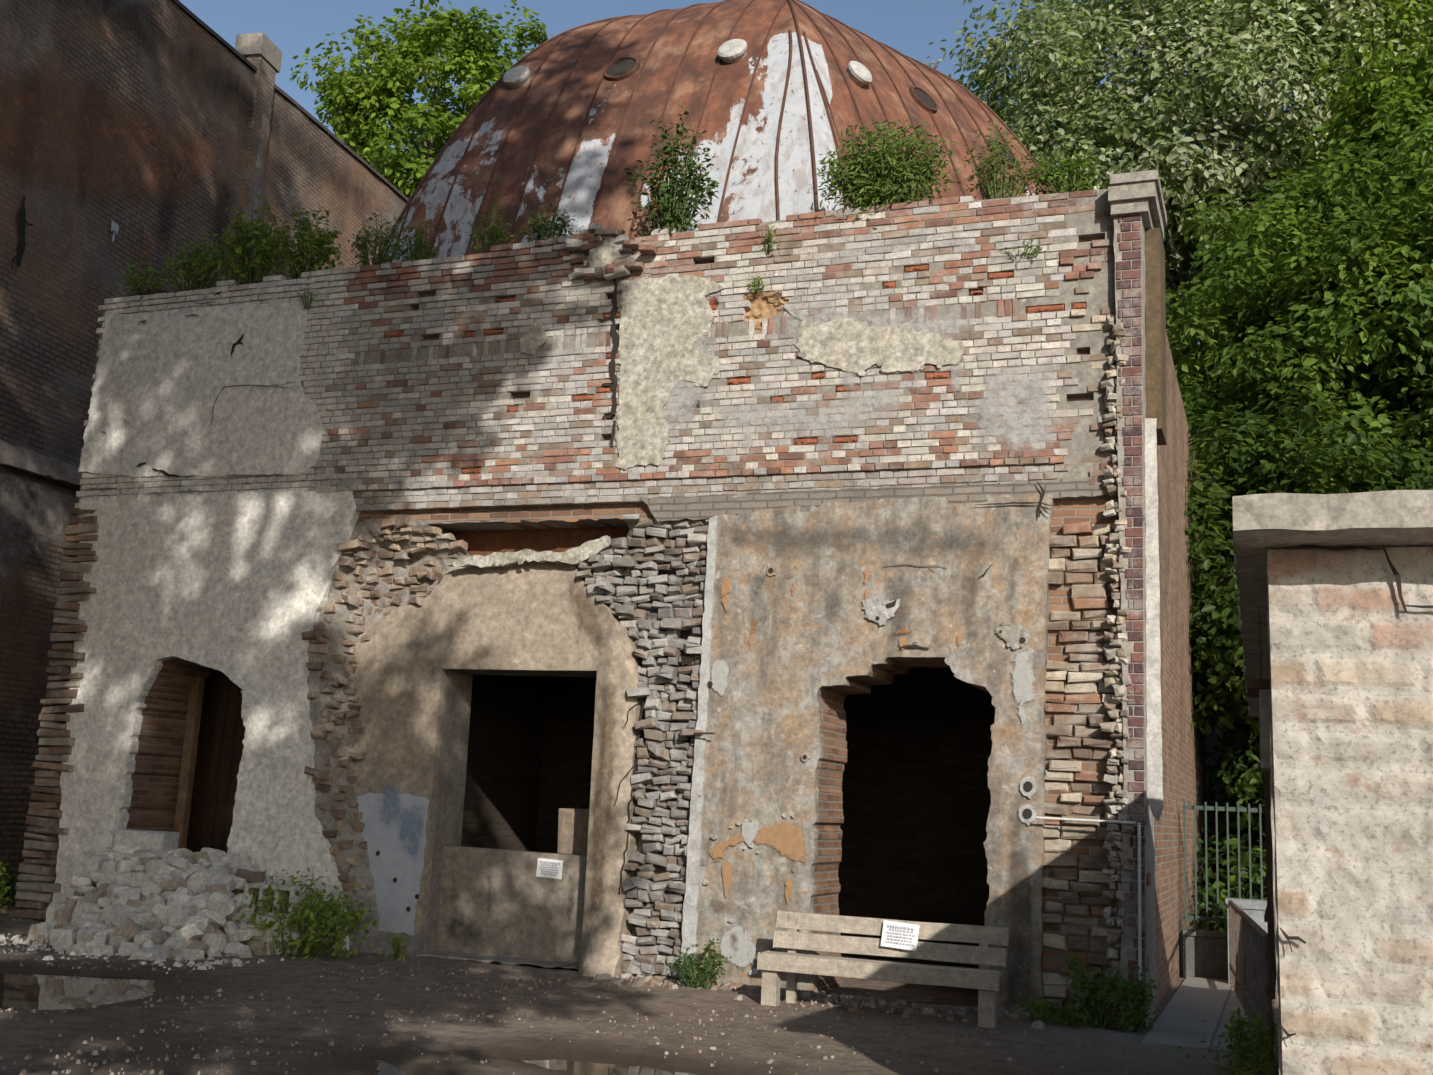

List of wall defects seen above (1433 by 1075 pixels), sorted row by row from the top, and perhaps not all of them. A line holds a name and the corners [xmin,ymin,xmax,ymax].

spalling [463,330,504,338]
crack [598,279,622,447]
peeling [573,274,751,470]
peeling [743,291,965,392]
spalling [883,265,929,289]
spalling [970,272,1014,296]
spalling [1026,303,1087,314]
spalling [794,436,857,445]
crack [1284,545,1433,612]
spalling [301,514,806,981]